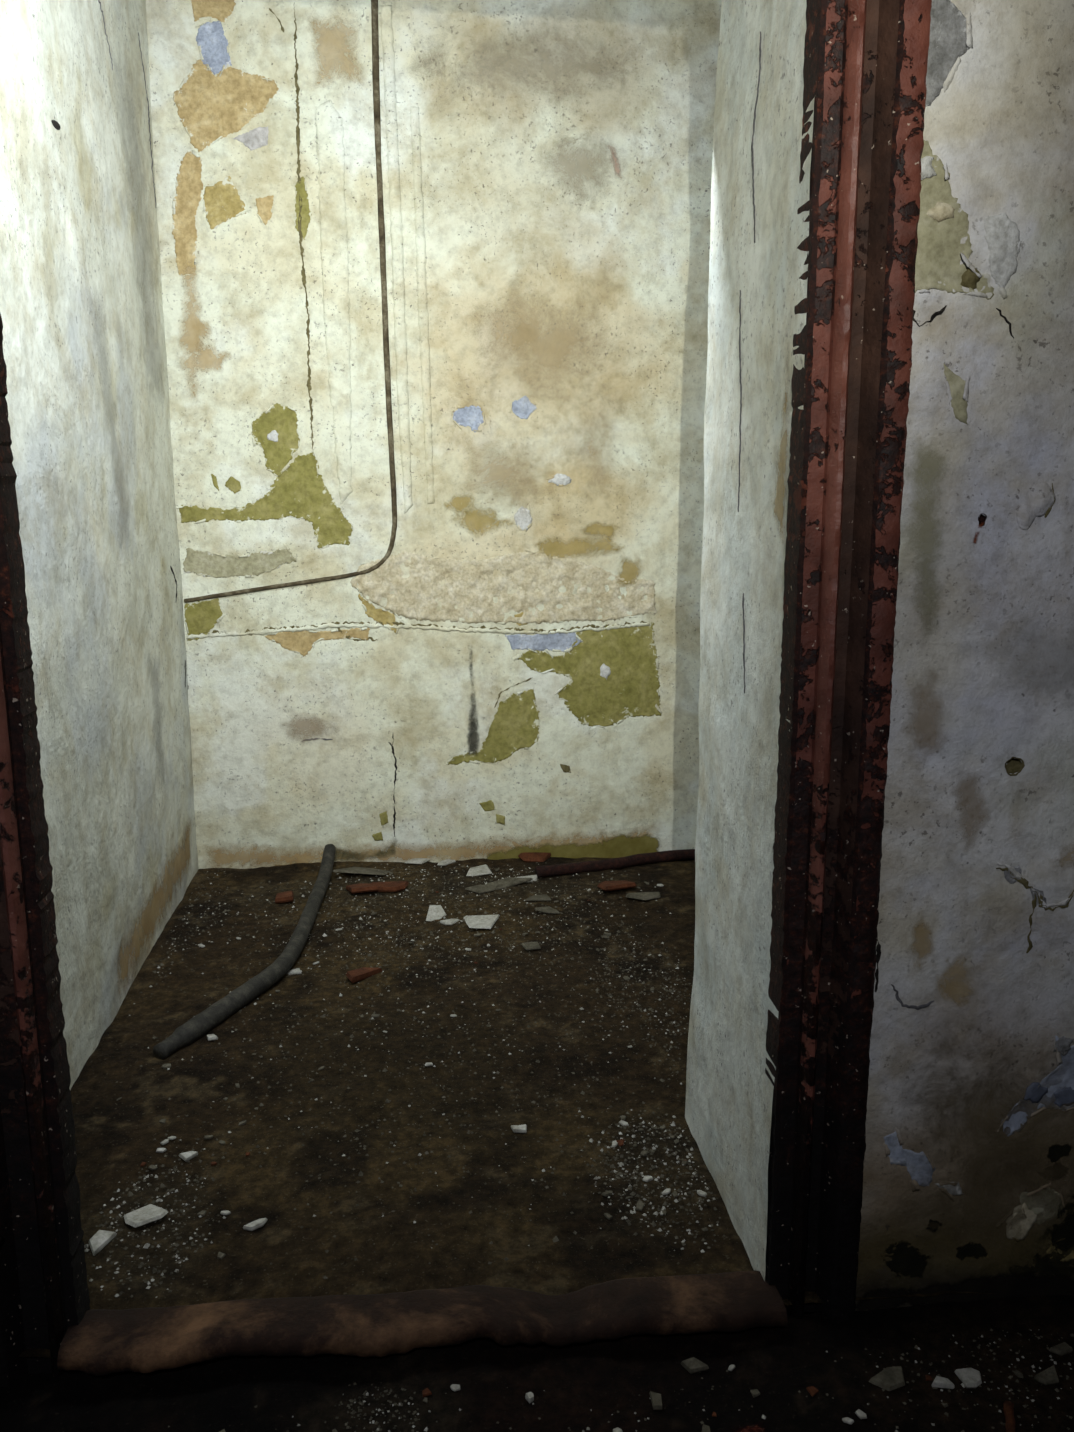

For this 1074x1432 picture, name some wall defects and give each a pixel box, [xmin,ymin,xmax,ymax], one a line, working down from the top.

water stain [314,23,354,83]
water stain [180,268,225,393]
flaking render [453,404,486,432]
peeling [176,403,353,549]
water stain [445,496,507,533]
peeling [183,543,297,578]
water stain [538,523,639,584]
peeling [184,598,226,641]
flaking render [265,549,663,728]
peeling [446,689,540,765]
peeling [997,1035,1074,1137]
water stain [856,1069,1074,1311]